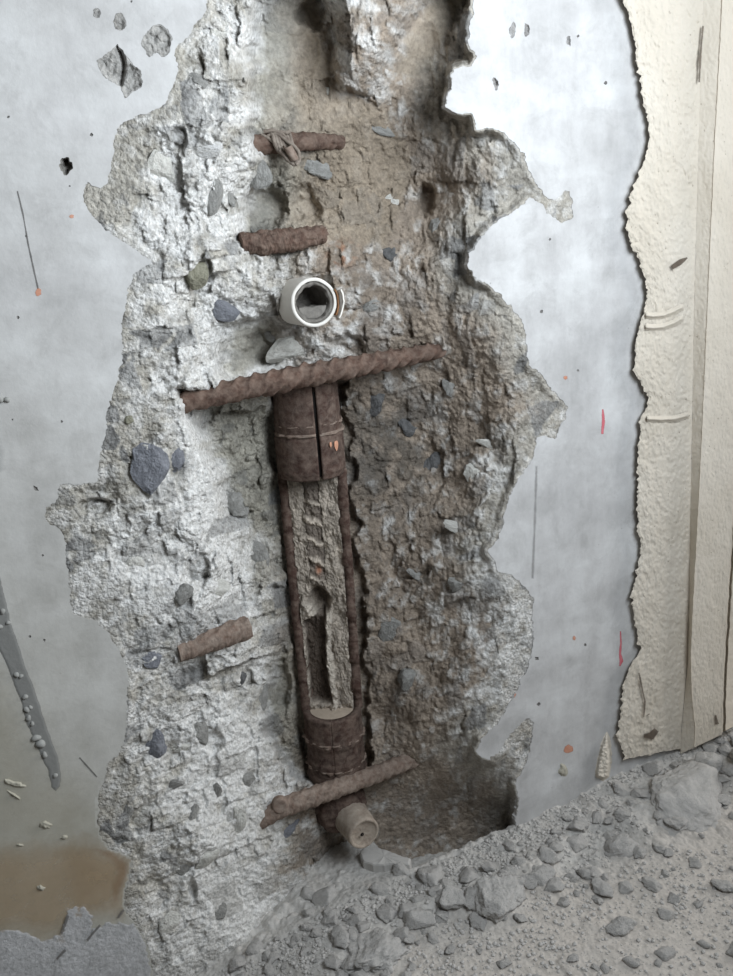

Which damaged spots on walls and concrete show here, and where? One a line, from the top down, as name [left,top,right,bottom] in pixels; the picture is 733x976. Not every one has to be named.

spalling [45,0,573,976]